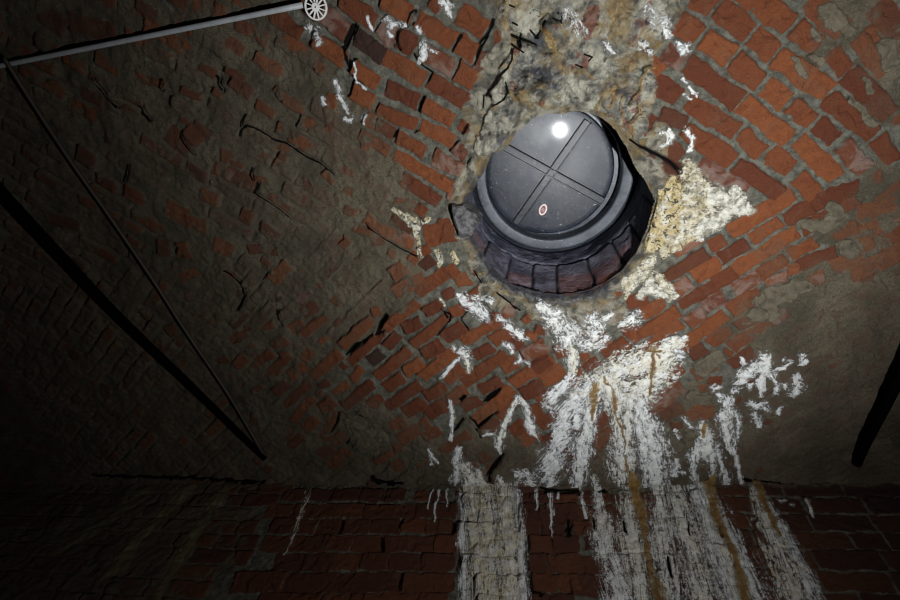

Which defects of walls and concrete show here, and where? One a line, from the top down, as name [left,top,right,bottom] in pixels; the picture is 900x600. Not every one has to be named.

crack [452,4,571,107]
spalling [474,0,672,156]
crack [239,114,334,175]
water stain [391,207,431,259]
spalling [452,201,484,238]
flaking render [796,201,849,234]
water stain [427,126,827,600]
rust [646,346,662,396]
flaking render [662,428,697,455]
rust [589,376,667,600]
rust [703,475,753,600]
rust [753,480,782,537]